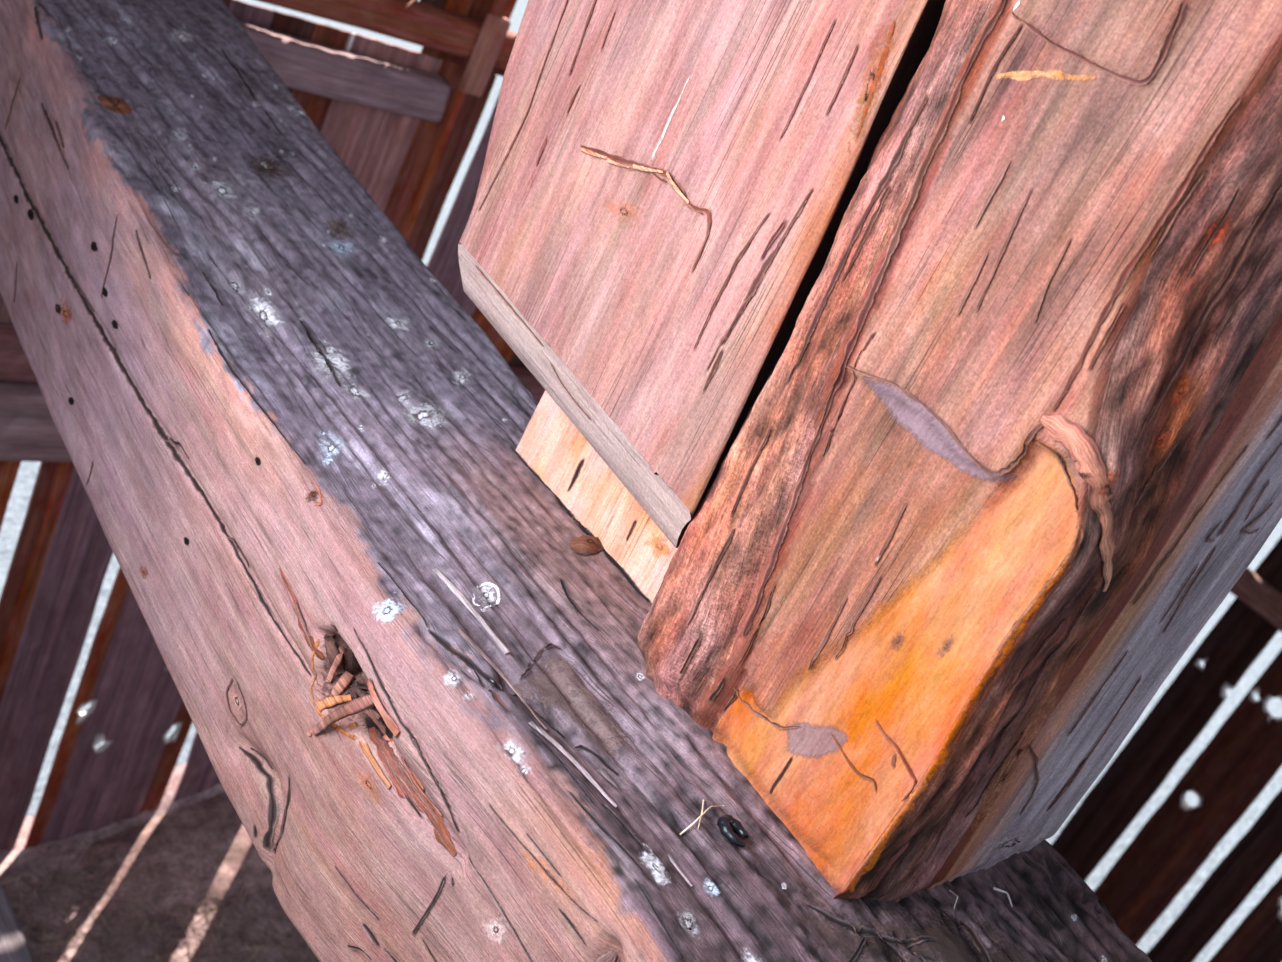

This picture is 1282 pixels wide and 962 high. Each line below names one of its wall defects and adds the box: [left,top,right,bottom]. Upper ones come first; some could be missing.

crack [220,48,281,135]
crack [0,136,311,675]
crack [299,320,341,386]
crack [694,0,1033,711]
spalling [364,707,393,742]
crack [680,427,771,674]
crack [770,757,792,794]
peeling [714,365,1115,893]